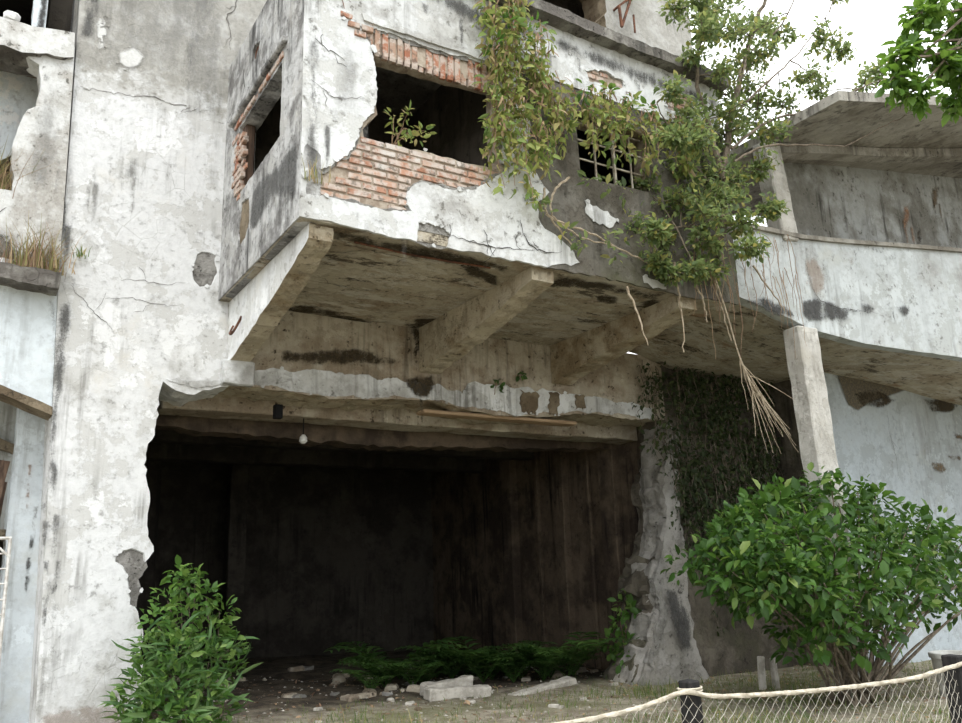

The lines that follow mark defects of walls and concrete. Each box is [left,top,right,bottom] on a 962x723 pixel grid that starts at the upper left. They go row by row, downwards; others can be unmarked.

crack [223,0,237,48]
flaking render [341,9,501,95]
flaking render [231,51,284,247]
damp [247,144,296,249]
flaking render [320,136,497,210]
flaking render [191,253,219,289]
damp [748,298,848,320]
damp [283,349,395,364]
peeling [254,366,653,420]
peeling [838,376,903,410]
peeling [925,399,957,412]
flaking render [113,548,148,607]